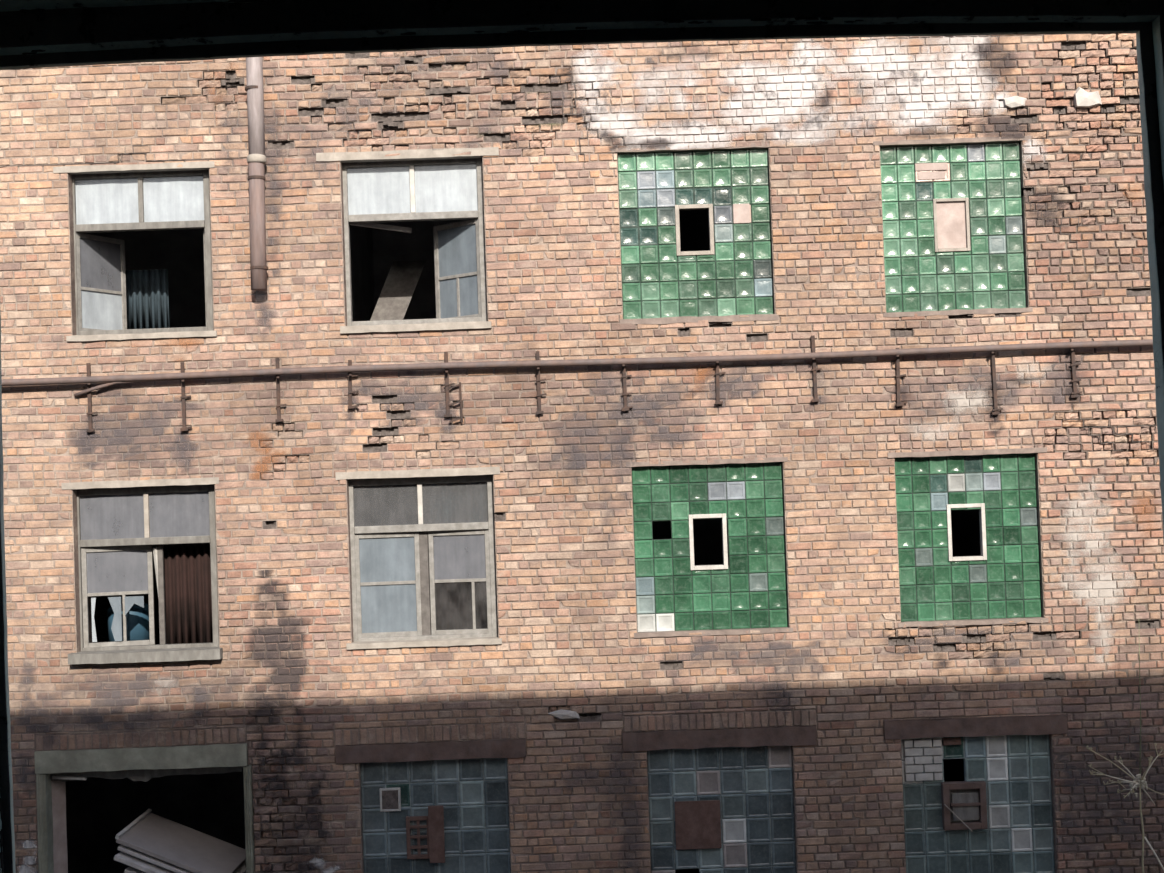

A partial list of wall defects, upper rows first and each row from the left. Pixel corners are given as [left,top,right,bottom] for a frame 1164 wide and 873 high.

water stain [978,44,994,56]
spalling [291,51,600,157]
water stain [676,75,703,126]
water stain [993,93,1008,109]
spalling [268,140,294,149]
spalling [942,33,1141,227]
spalling [1127,288,1151,297]
spalling [441,385,465,425]
spalling [357,395,459,459]
spalling [883,623,1079,659]
spalling [1043,672,1064,681]